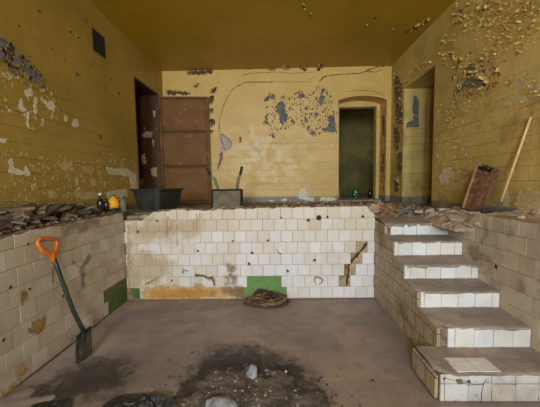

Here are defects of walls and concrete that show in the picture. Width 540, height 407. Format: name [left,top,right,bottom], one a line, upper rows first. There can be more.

peeling [0,36,60,130]
peeling [1,150,143,207]
peeling [166,70,213,96]
flaking render [215,134,232,172]
crack [219,72,286,130]
peeling [263,86,337,139]
crack [304,66,384,82]
peeling [379,54,431,195]
peeling [435,0,540,198]
spalling [0,187,377,398]
crack [346,242,368,287]